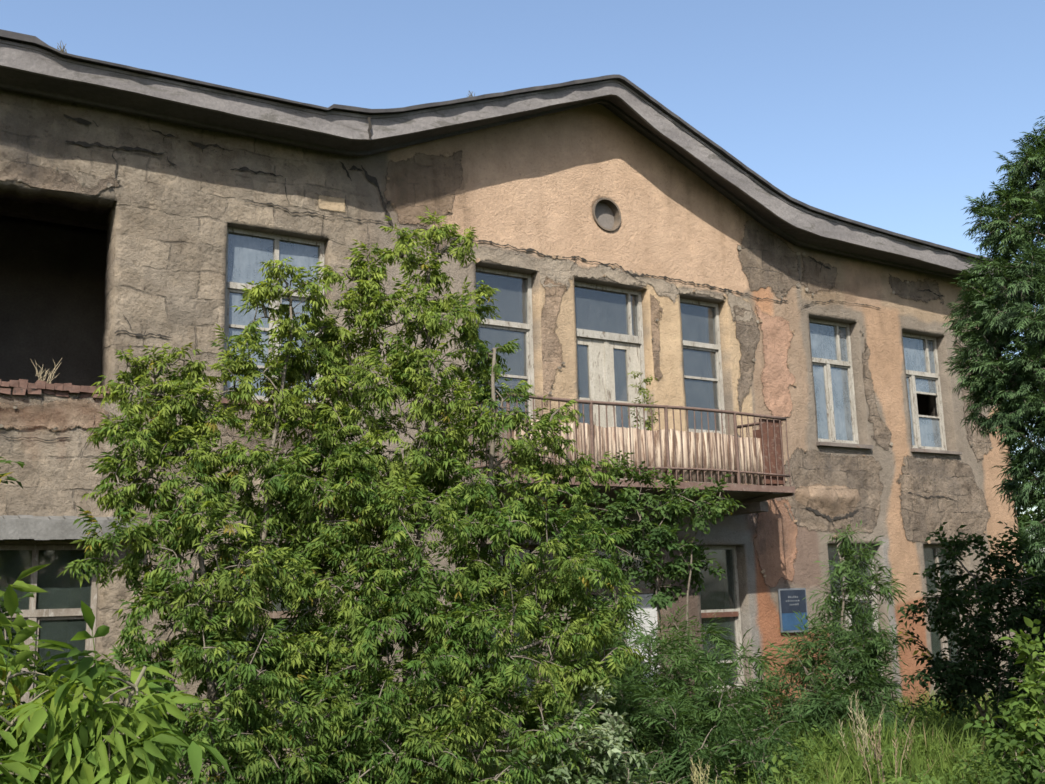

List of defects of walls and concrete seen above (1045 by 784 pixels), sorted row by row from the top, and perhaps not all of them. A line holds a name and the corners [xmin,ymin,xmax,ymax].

spalling [0,158,120,195]
crack [63,114,393,226]
spalling [318,195,345,212]
peeling [384,150,463,253]
spalling [889,274,944,305]
spalling [461,220,837,425]
spalling [0,398,109,431]
spalling [224,405,325,454]
spalling [754,331,993,587]